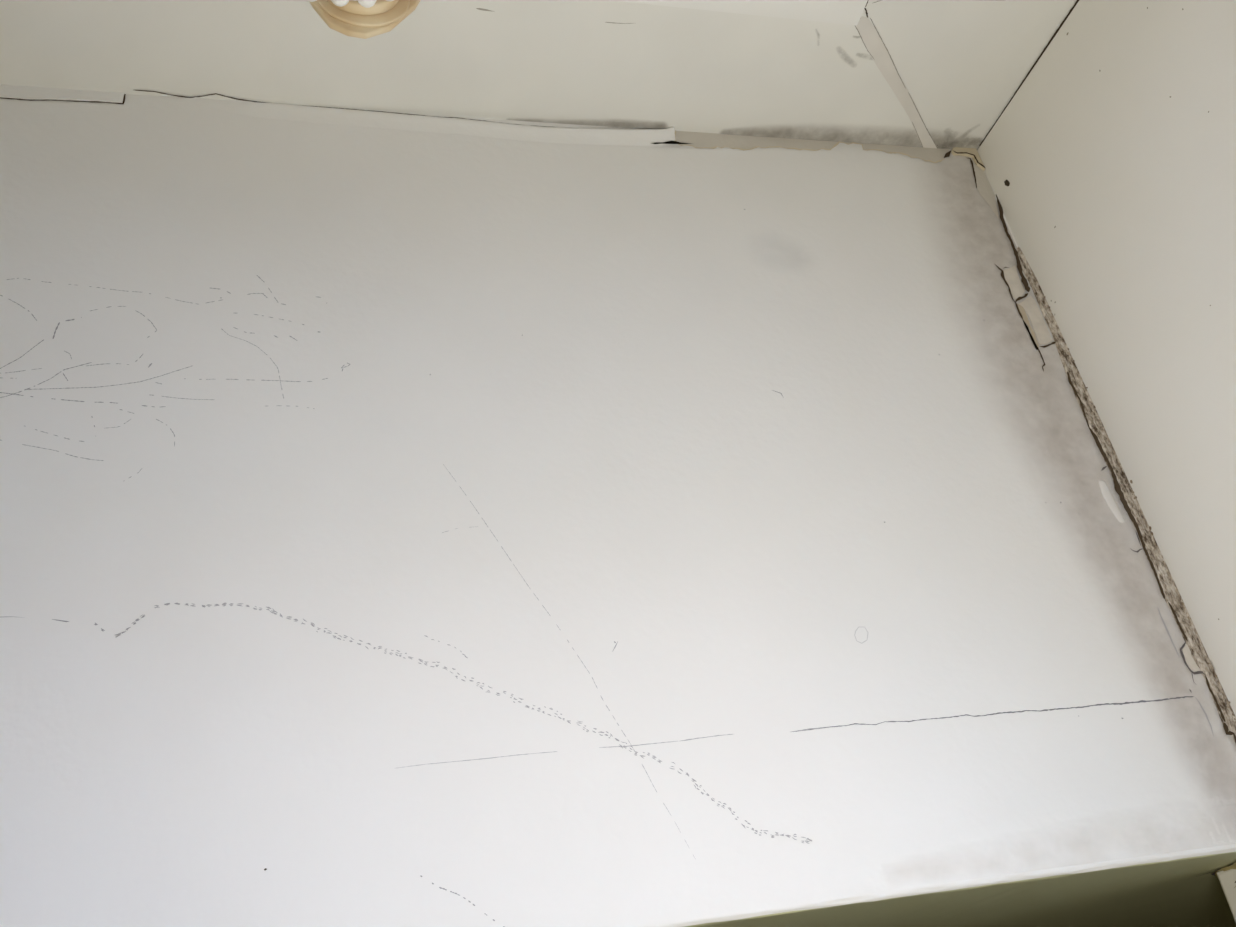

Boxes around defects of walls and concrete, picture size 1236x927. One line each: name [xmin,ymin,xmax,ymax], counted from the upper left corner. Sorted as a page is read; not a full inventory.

peeling [0,85,1000,220]
crack [792,195,1236,742]